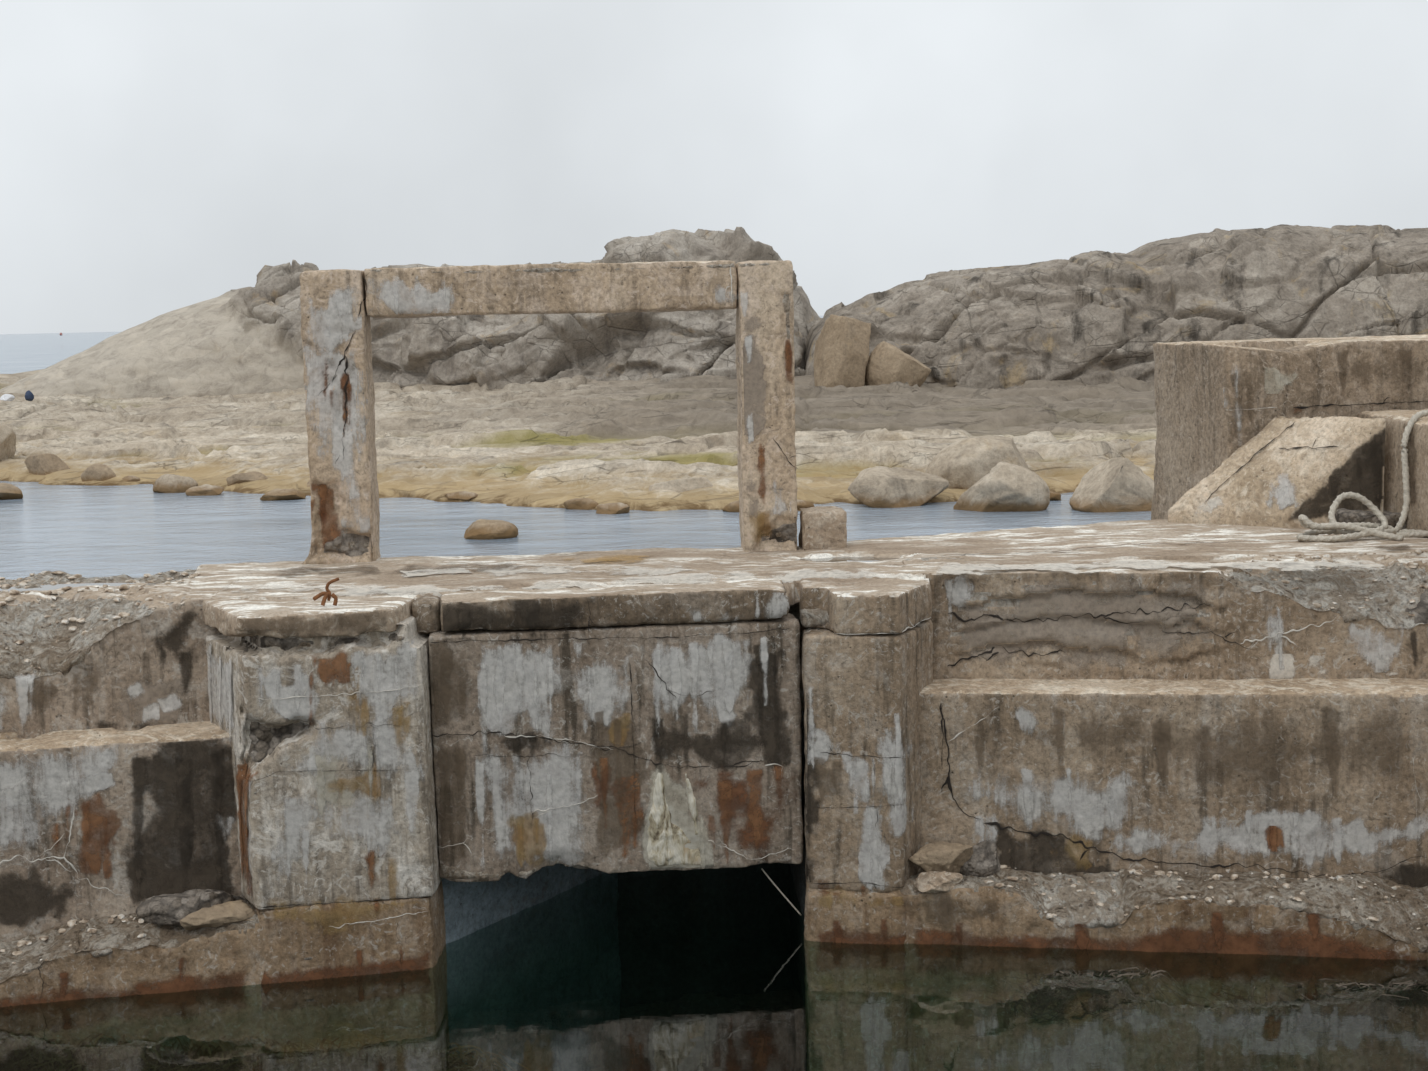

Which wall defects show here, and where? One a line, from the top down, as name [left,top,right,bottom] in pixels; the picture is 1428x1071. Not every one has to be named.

crack [319,273,369,463]
rust [313,577,339,606]
crack [836,603,1332,667]
rust [309,653,369,731]
damp [224,563,913,890]
damp [0,867,73,926]
rust [52,794,120,878]
spalling [441,863,574,881]
rust [592,758,644,857]
rust [695,766,783,862]
rust [819,912,1419,960]
crack [939,704,1426,877]